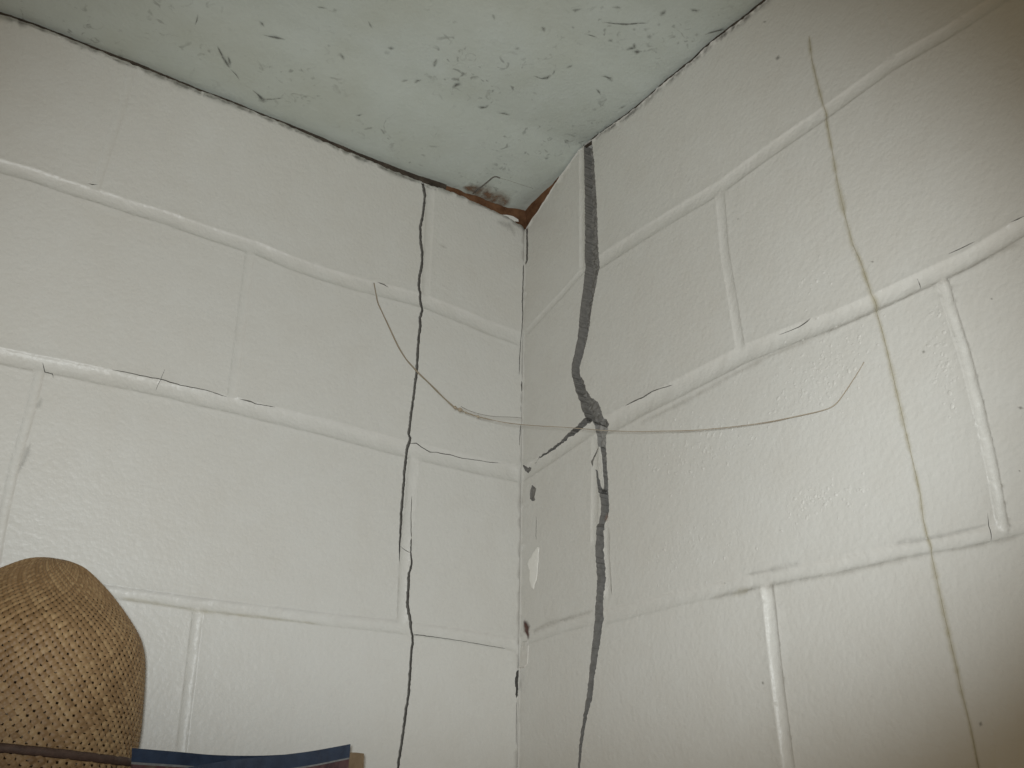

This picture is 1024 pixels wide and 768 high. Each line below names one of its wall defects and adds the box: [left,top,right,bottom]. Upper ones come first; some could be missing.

crack [397,183,505,768]
peeling [528,547,539,589]
crack [519,146,612,768]